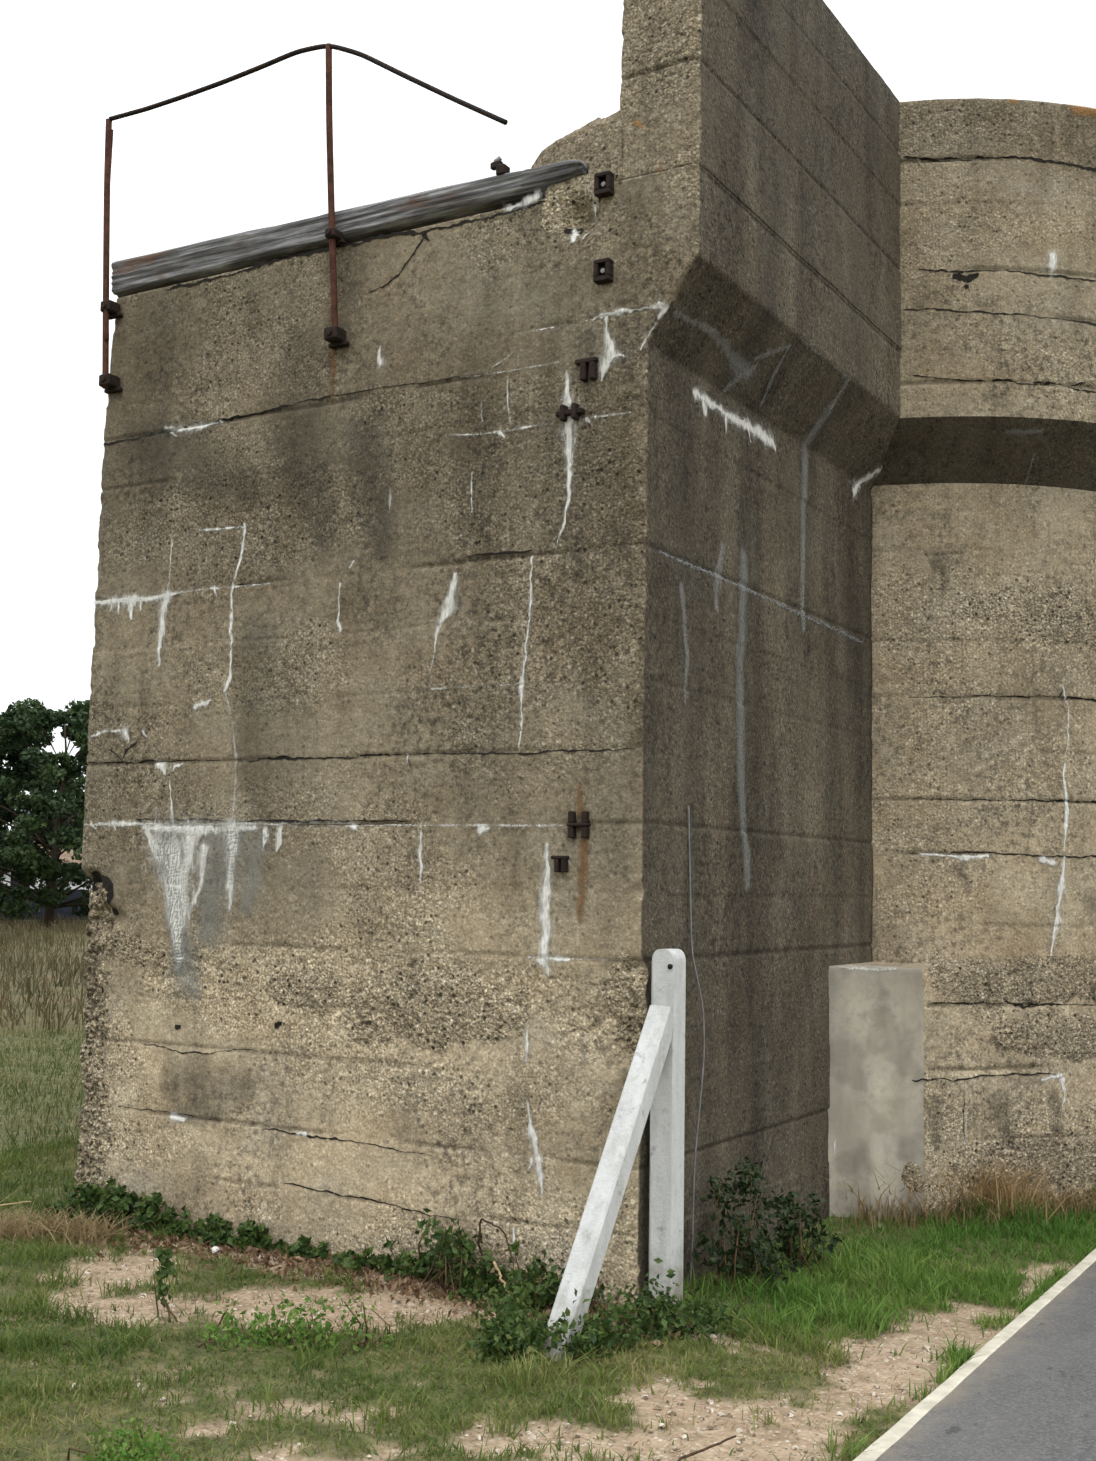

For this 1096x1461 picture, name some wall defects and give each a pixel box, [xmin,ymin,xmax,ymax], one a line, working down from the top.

crack [169,201,544,293]
leakage [557,372,608,543]
leakage [94,542,177,666]
leakage [194,523,256,709]
leakage [433,572,457,658]
leakage [84,763,454,968]
leakage [473,824,574,977]
spalling [74,871,178,1197]
crack [143,1043,253,1055]
crack [116,1106,222,1121]
crack [264,1128,432,1156]
crack [284,1183,461,1220]